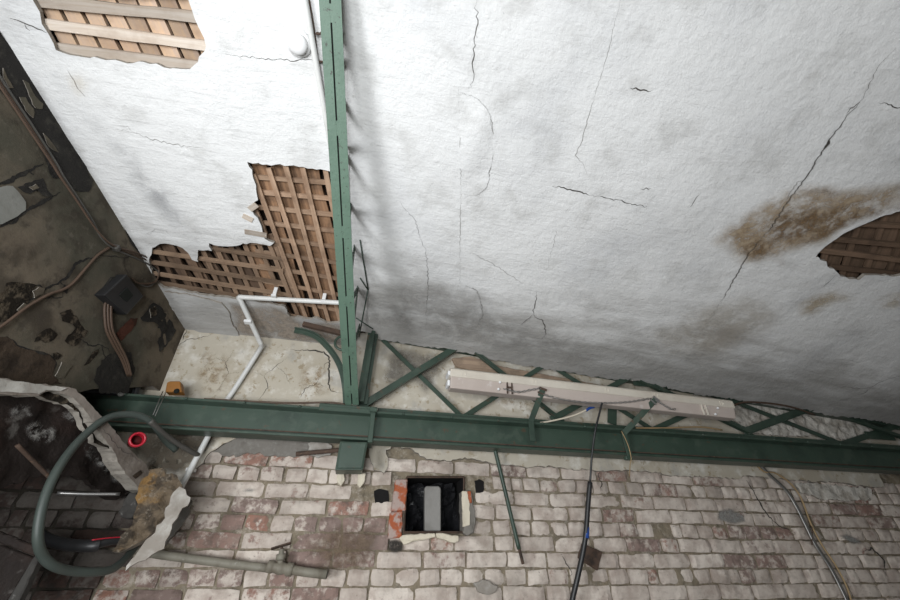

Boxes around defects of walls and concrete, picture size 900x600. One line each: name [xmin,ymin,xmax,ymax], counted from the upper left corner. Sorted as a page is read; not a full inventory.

flaking render [37,0,206,68]
crack [458,2,478,93]
flaking render [151,163,340,321]
crack [459,169,546,335]
crack [558,186,651,207]
crack [710,50,900,319]
leakage [729,190,893,259]
flaking render [817,212,900,278]
crack [258,349,337,400]
spalling [467,479,484,503]